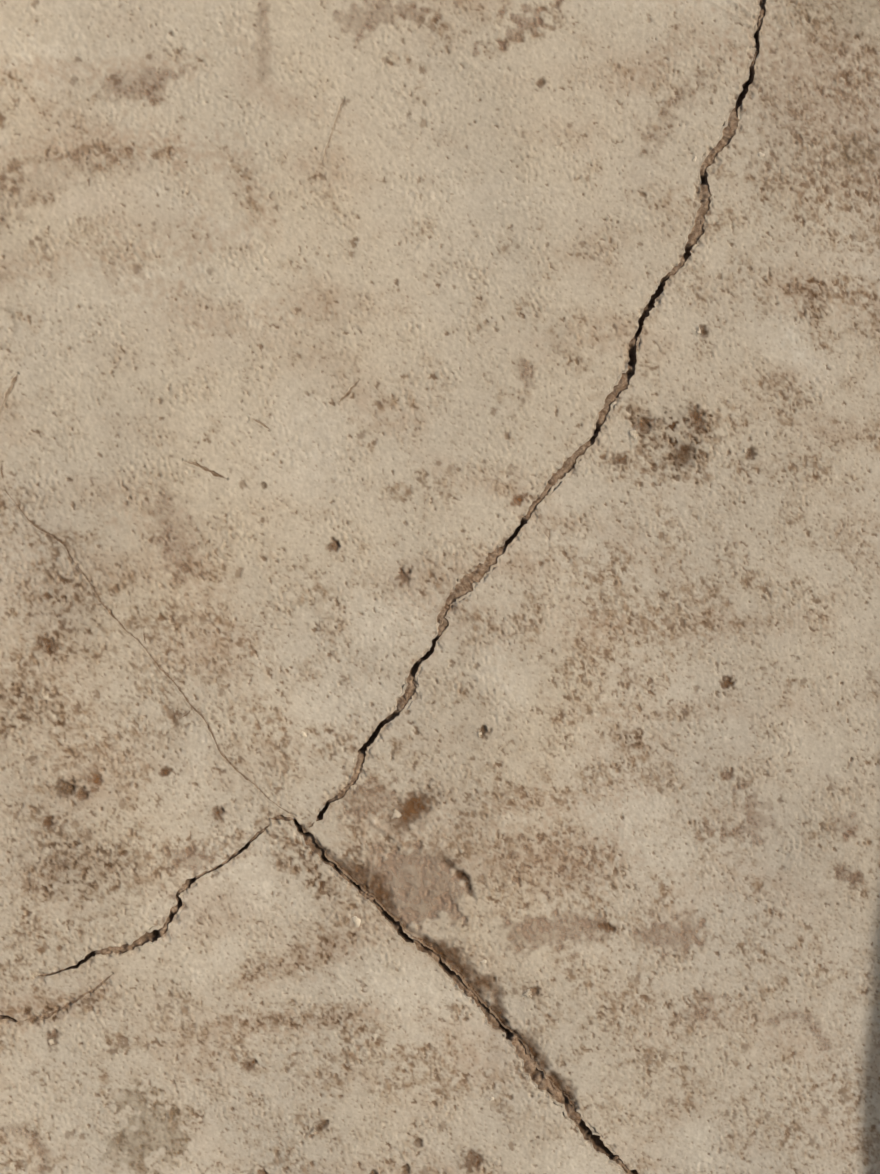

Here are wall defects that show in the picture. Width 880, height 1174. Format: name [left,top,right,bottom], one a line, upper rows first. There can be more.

crack [0,462,643,1174]
crack [302,0,768,833]